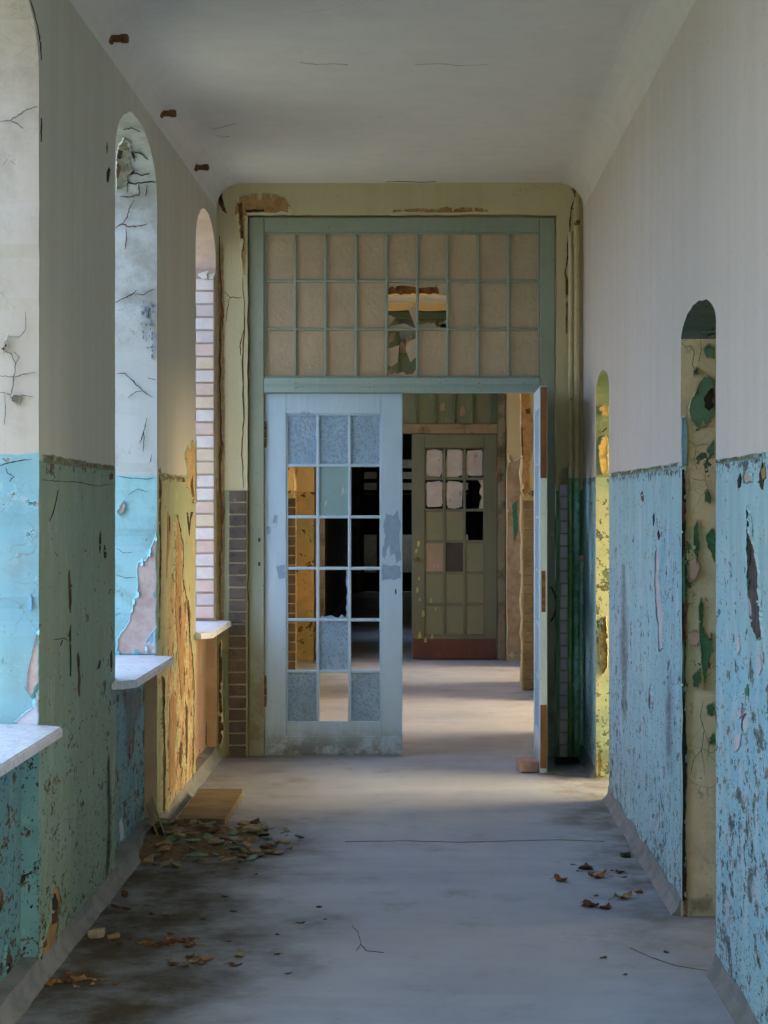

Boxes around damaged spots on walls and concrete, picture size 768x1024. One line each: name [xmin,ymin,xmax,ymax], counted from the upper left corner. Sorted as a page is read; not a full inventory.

crack [30,0,42,60]
crack [0,106,42,142]
crack [115,127,155,249]
spalling [218,192,292,278]
crack [0,312,34,425]
peeling [40,454,115,480]
crack [118,373,155,495]
peeling [707,451,768,490]
flaking render [98,267,226,813]
peeling [746,505,764,641]
spalling [14,628,40,725]
peeling [598,434,715,902]